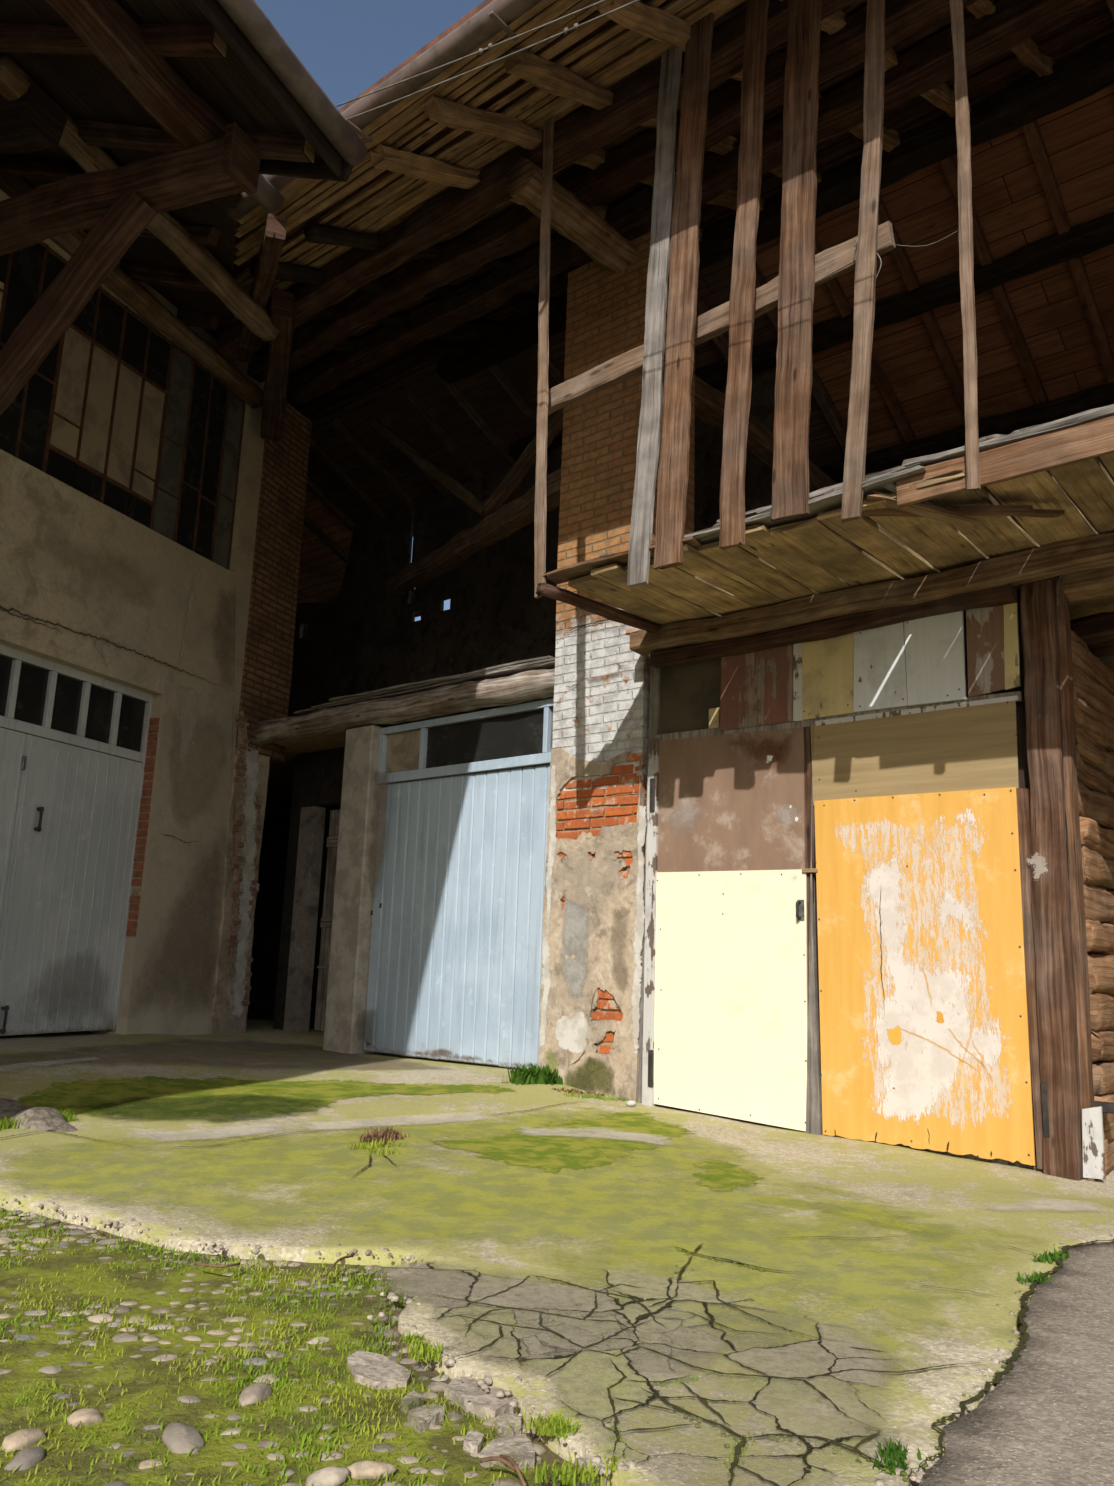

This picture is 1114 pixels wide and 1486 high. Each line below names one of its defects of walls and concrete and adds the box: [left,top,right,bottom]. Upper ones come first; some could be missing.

crack [0,605,229,691]
peeling [540,752,646,1058]
peeling [832,808,1019,1136]
crack [384,1239,1114,1486]